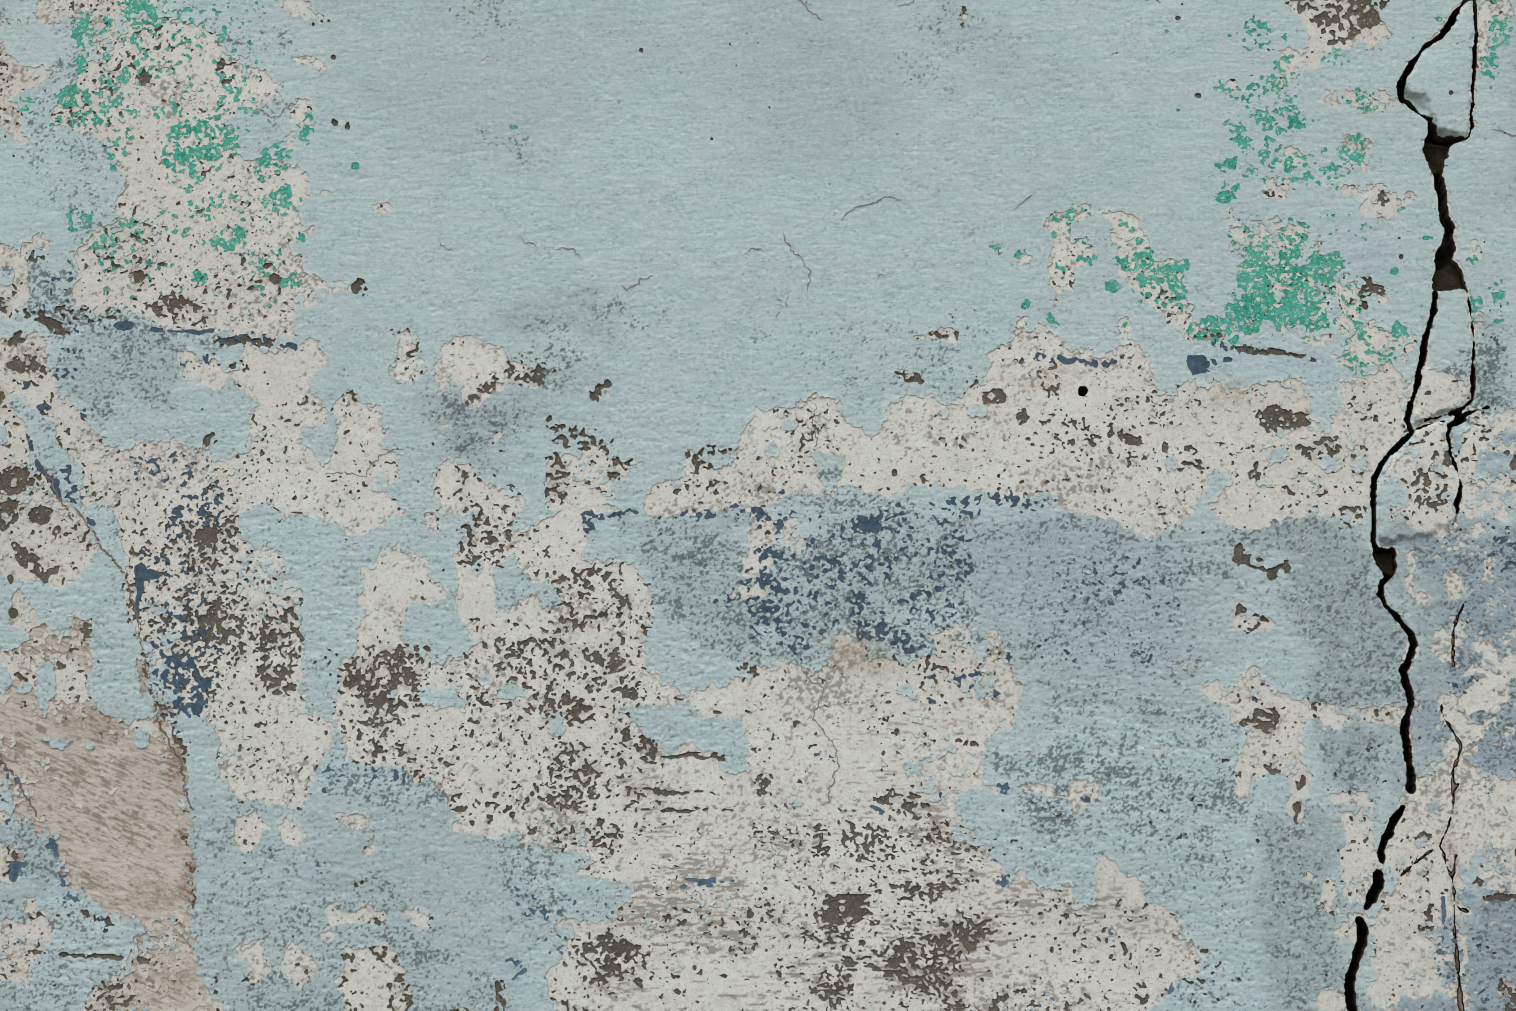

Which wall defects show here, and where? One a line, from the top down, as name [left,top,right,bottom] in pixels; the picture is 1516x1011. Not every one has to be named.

peeling [274,0,330,26]
crack [1396,0,1474,100]
peeling [913,316,959,347]
peeling [389,328,557,446]
peeling [589,379,612,402]
crack [1370,137,1463,597]
crack [1446,403,1468,434]
crack [1451,606,1463,667]
peeling [334,812,377,857]
crack [1344,637,1468,1011]
peeling [234,899,414,1011]
peeling [449,958,527,1011]